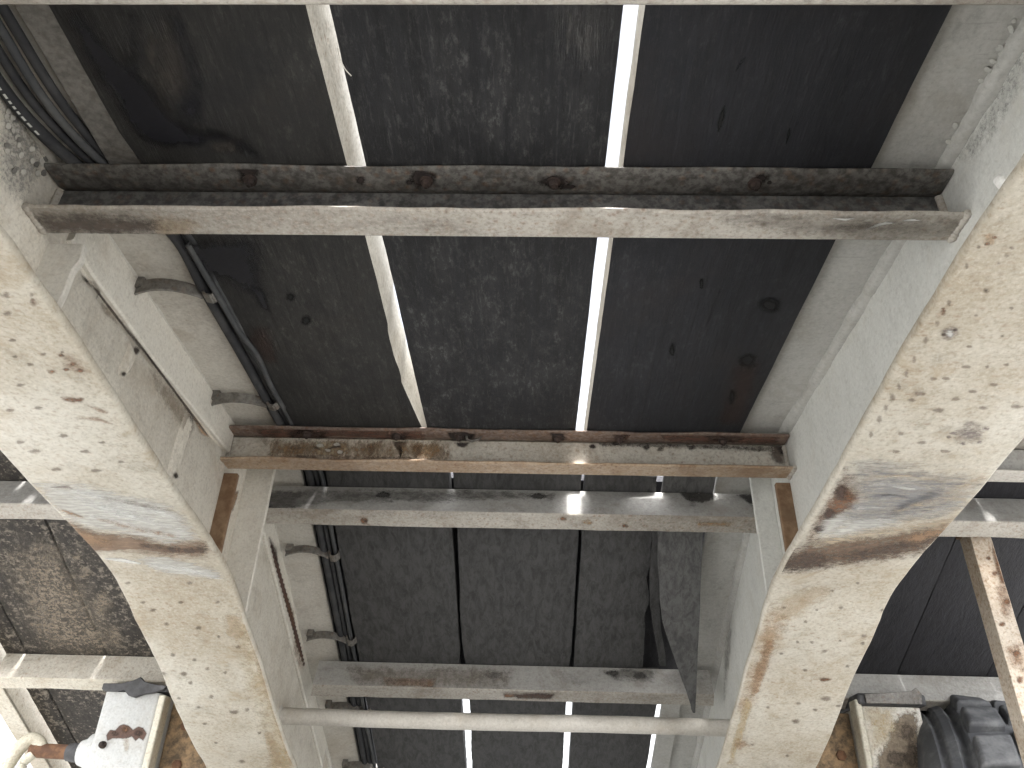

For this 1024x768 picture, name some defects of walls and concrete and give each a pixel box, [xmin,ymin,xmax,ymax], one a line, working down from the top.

rust [406,171,436,189]
rust [259,429,474,459]
rust [65,519,208,557]
rust [782,474,949,572]
leakage [812,475,956,546]
rust [986,544,1010,626]
rust [1010,645,1023,683]